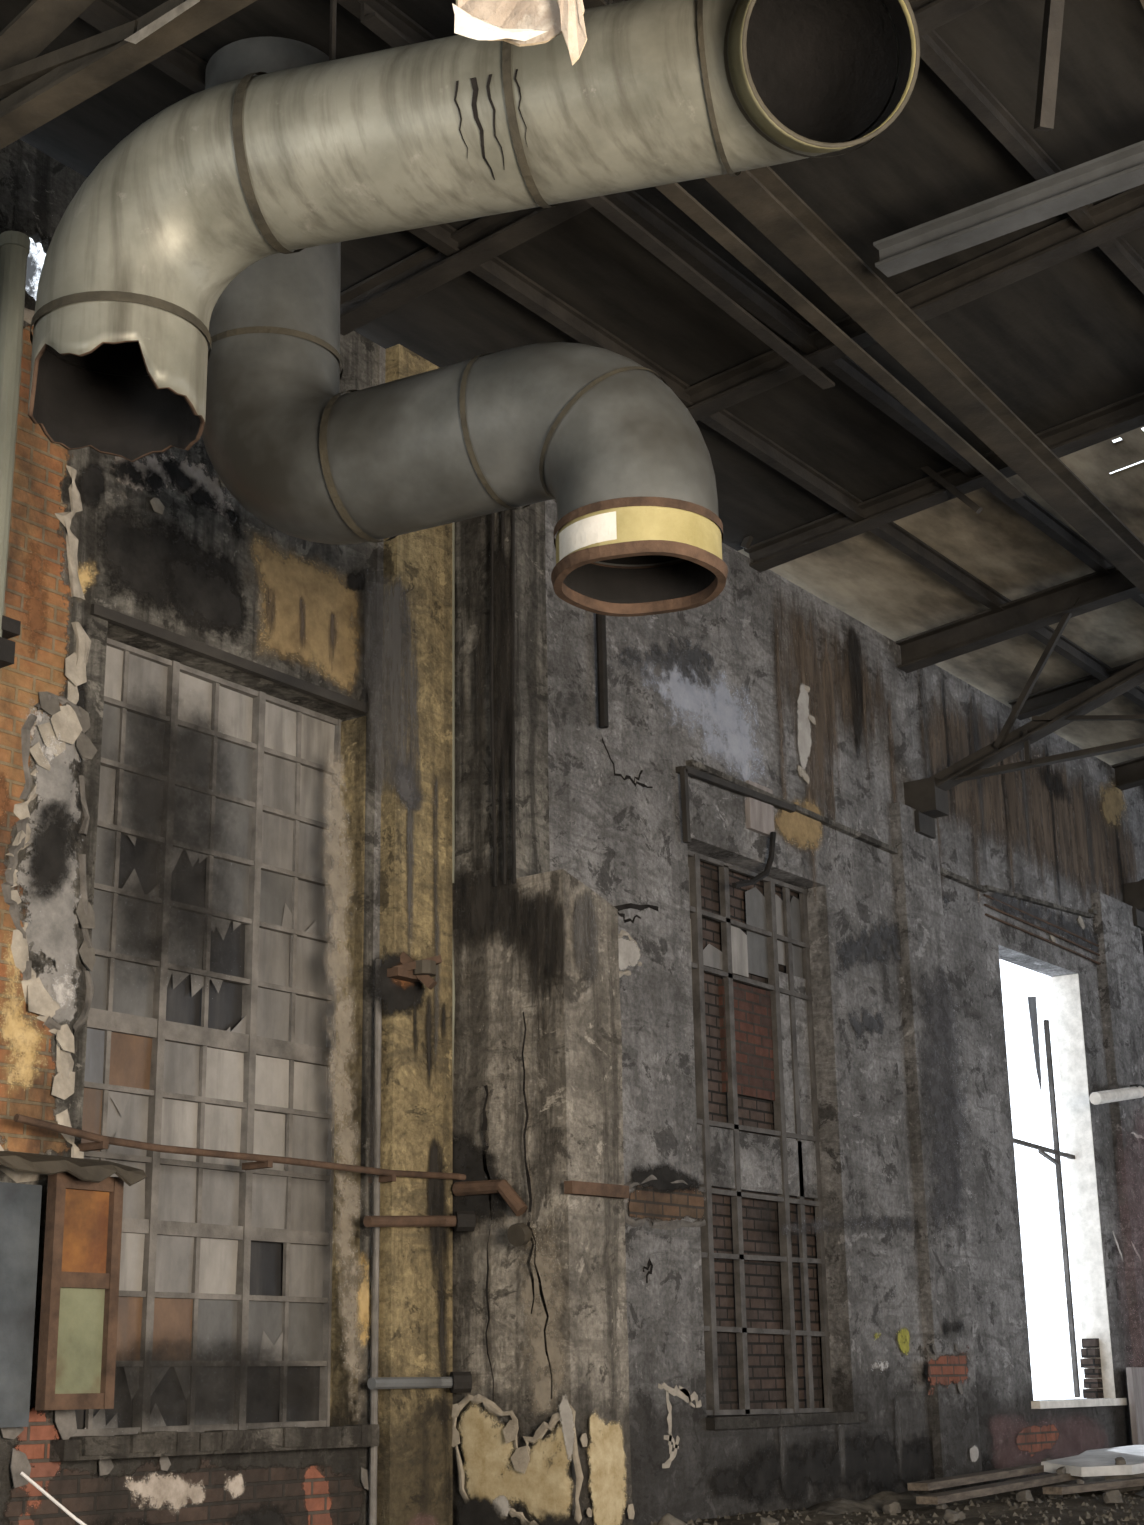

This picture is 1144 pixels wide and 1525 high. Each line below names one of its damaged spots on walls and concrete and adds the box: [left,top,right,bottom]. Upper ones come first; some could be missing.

peeling [452,0,587,66]
spalling [0,307,98,1183]
damp [920,669,1019,777]
damp [936,746,1137,914]
damp [573,893,598,984]
damp [837,921,902,975]
crack [481,1012,553,1401]
spalling [0,1392,369,1525]
peeling [451,1394,635,1525]